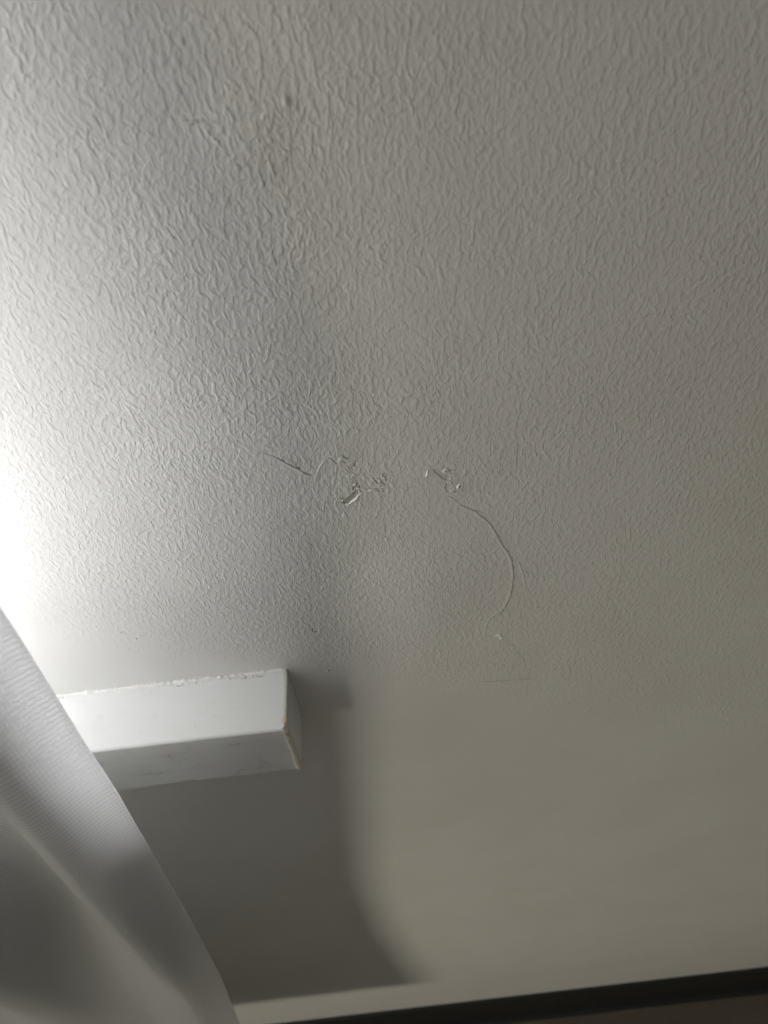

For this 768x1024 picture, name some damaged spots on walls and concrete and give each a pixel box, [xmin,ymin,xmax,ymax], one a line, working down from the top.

crack [259,452,314,476]
peeling [316,455,388,504]
crack [456,501,526,640]